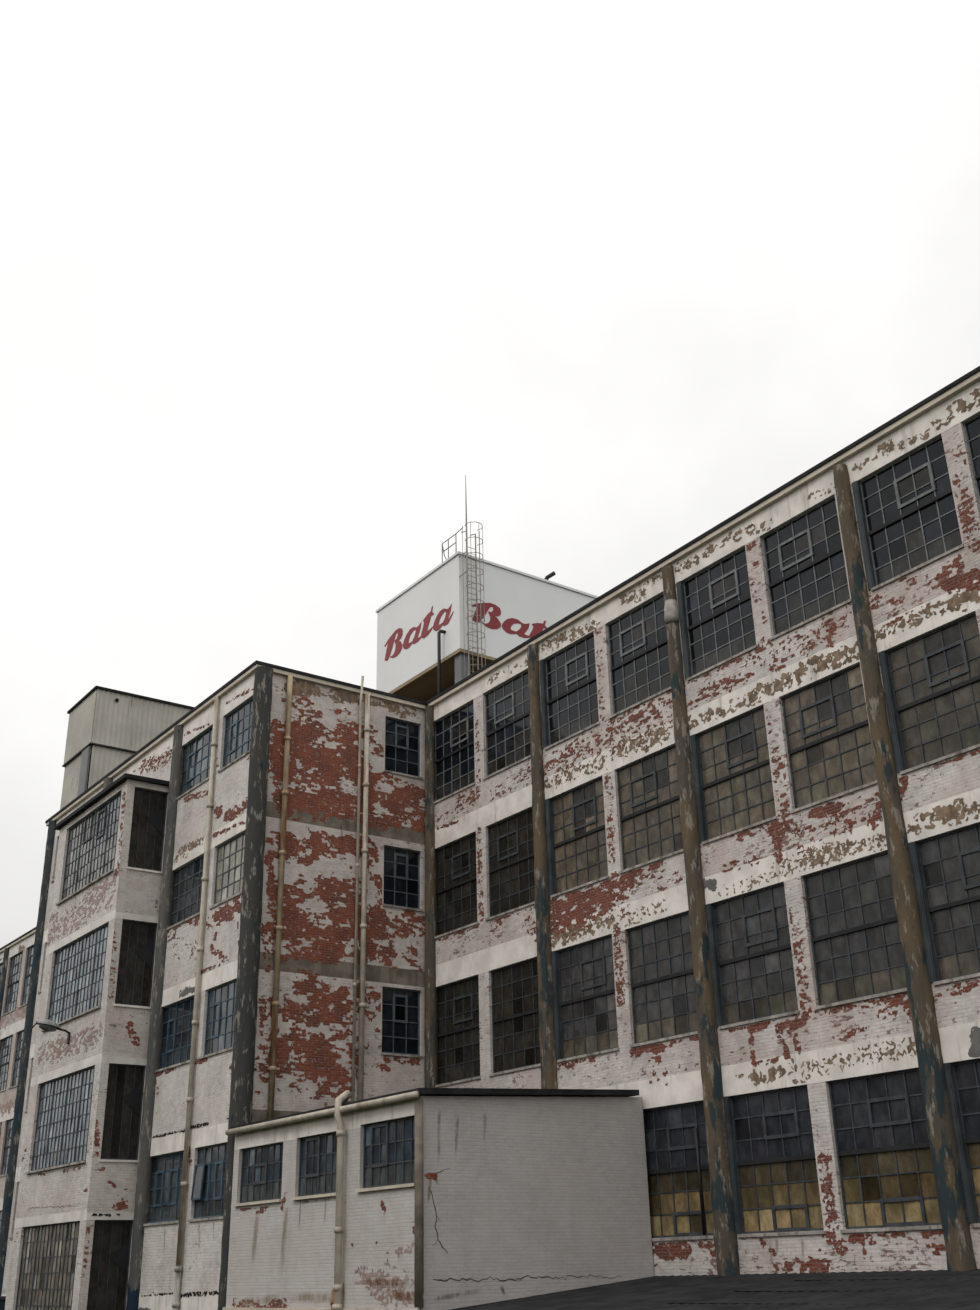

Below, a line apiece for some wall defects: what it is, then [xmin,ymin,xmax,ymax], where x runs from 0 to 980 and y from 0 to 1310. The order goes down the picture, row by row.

peeling [852,388,980,471]
peeling [869,444,980,641]
peeling [254,518,887,1107]
peeling [907,798,980,835]
peeling [729,908,917,1086]
peeling [933,979,980,1002]
spalling [968,1026,980,1057]
peeling [354,1221,425,1308]
crack [431,1168,621,1282]
peeling [652,1241,716,1267]
peeling [759,1151,905,1273]
peeling [921,1231,946,1255]